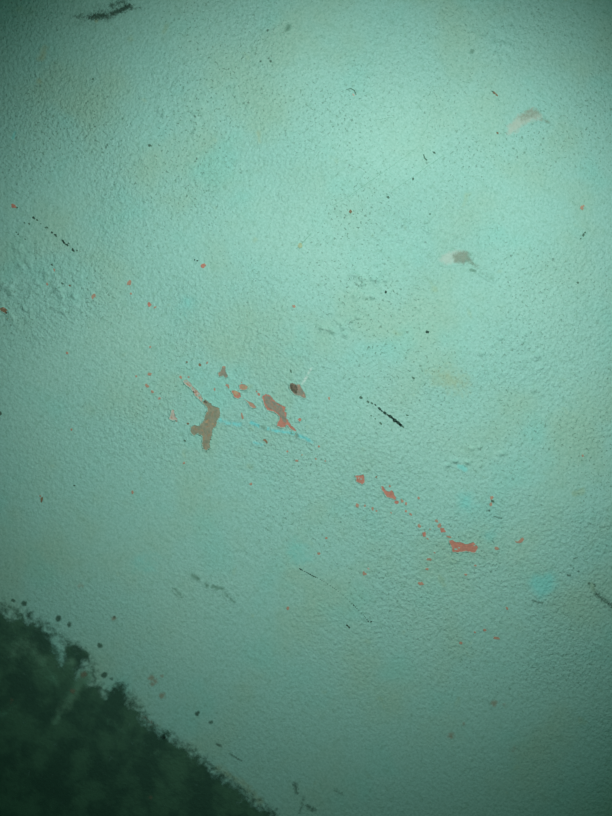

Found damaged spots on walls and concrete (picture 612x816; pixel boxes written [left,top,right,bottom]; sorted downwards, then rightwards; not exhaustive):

peeling [168,376,222,452]
peeling [214,365,302,434]
peeling [288,382,308,400]
peeling [354,473,412,516]
peeling [418,519,479,554]